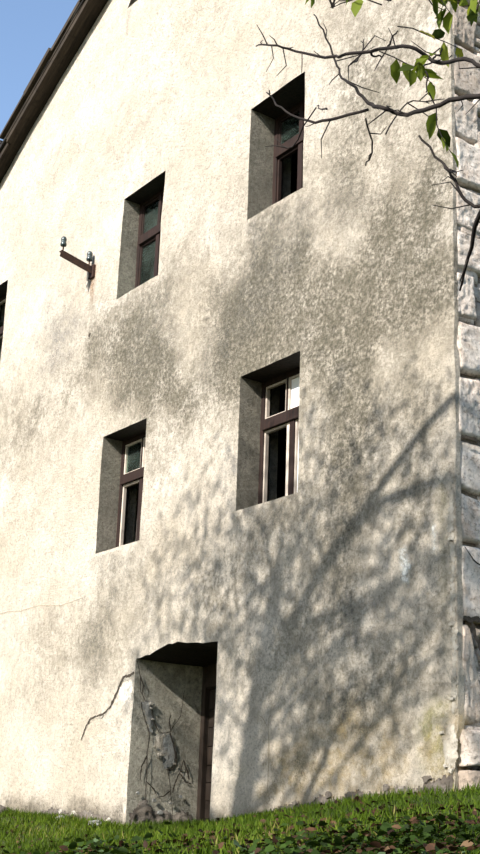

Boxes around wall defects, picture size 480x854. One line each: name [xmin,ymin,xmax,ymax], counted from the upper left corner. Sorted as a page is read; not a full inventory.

crack [463,616,480,651]
crack [81,661,191,815]